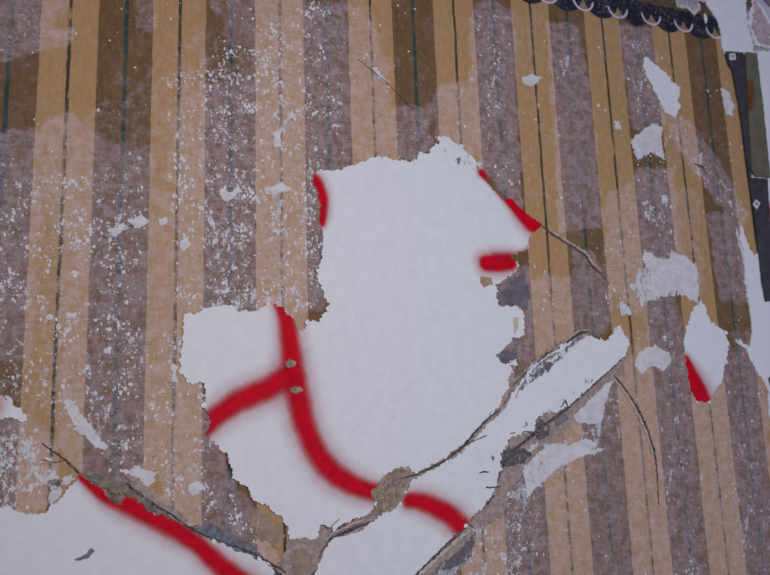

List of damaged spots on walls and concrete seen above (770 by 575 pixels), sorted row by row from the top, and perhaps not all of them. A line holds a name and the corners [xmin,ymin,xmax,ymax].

peeling [643,57,681,118]
peeling [704,0,770,164]
crack [536,220,609,283]
peeling [0,136,630,575]
peeling [683,223,770,420]
crack [42,443,89,477]
crack [397,329,591,480]
crack [480,355,659,509]
crack [127,483,286,575]
crack [311,518,371,575]
crack [415,517,470,575]